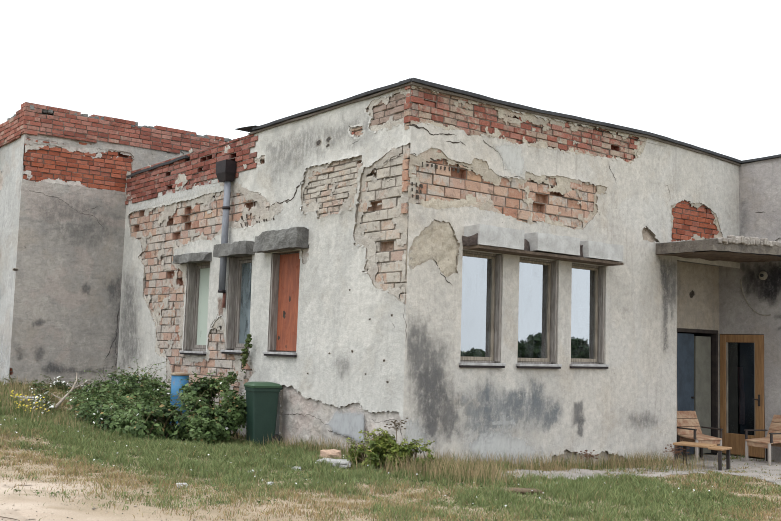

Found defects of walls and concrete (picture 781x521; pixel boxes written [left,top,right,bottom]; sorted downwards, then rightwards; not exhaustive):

spalling [349,85,648,164]
spalling [23,131,283,408]
spalling [299,143,607,305]
spalling [642,226,659,243]
spalling [670,199,781,247]
spalling [278,385,403,452]
leakage [406,329,558,463]
leakage [574,403,584,436]